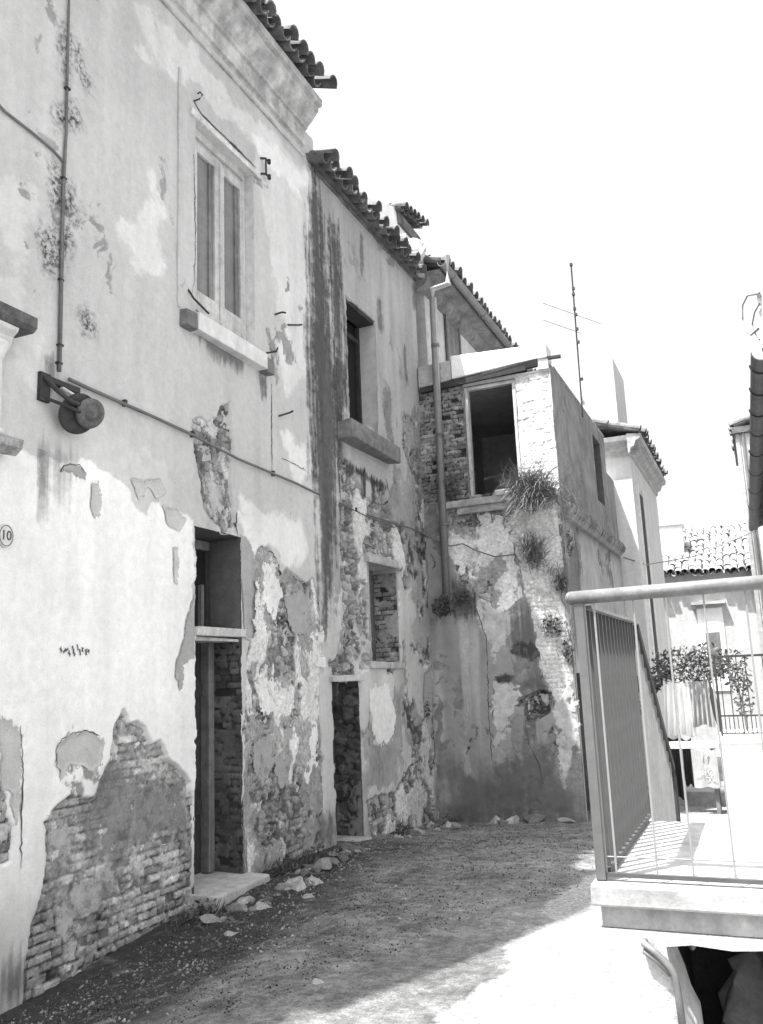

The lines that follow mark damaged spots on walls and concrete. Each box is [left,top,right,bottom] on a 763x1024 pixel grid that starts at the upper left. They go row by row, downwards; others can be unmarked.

leakage [38,228,74,273]
leakage [51,167,77,216]
leakage [305,165,388,635]
peeling [132,478,187,531]
peeling [175,595,196,690]
flaking render [191,404,408,873]
flaking render [383,372,573,818]
peeling [0,717,23,864]
flaking render [22,713,192,1002]
flaking render [366,668,435,836]